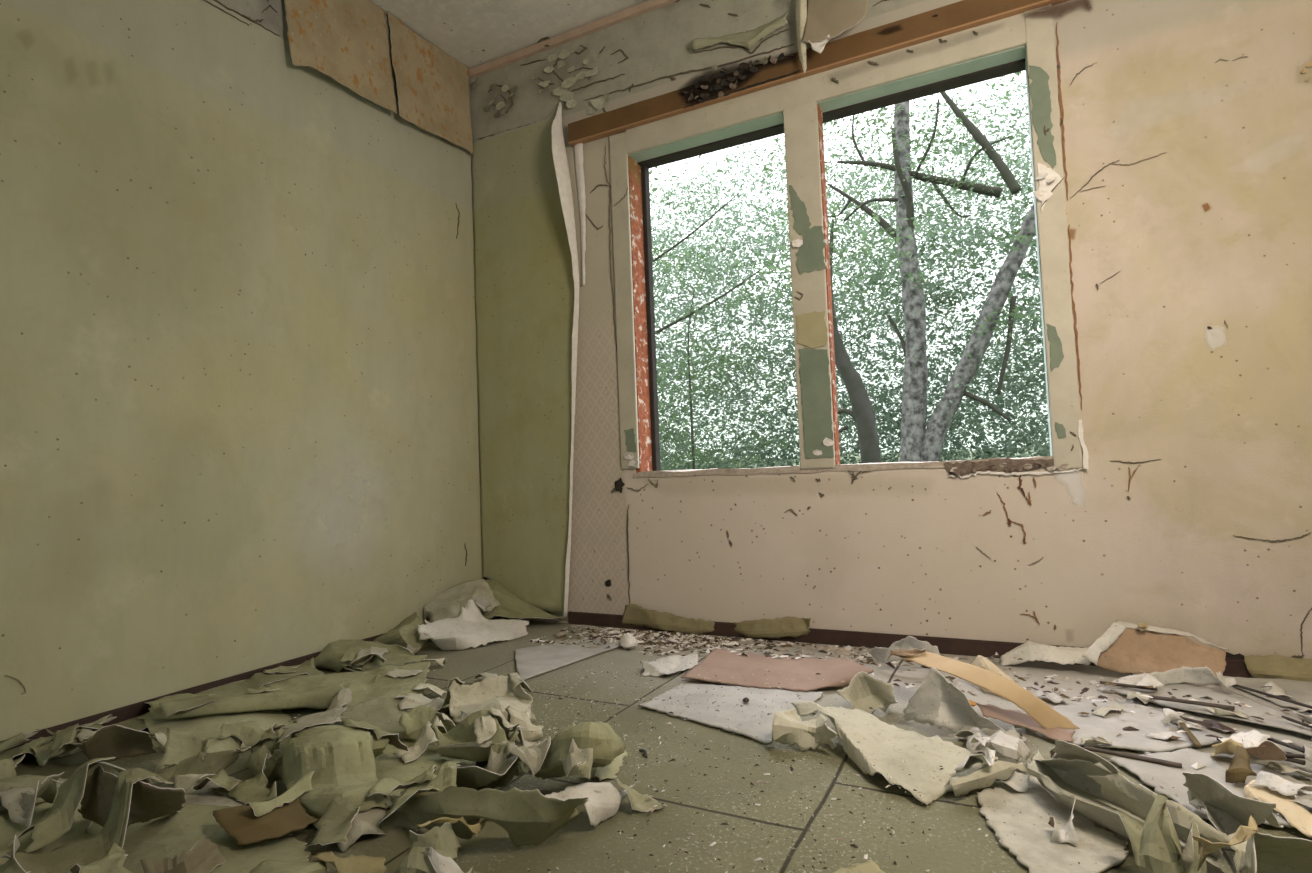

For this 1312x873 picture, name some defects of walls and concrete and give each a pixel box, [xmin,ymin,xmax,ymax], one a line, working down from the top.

crack [204,0,280,36]
crack [1070,152,1166,199]
spalling [1207,320,1228,347]
crack [1111,459,1161,500]
crack [1236,532,1311,542]